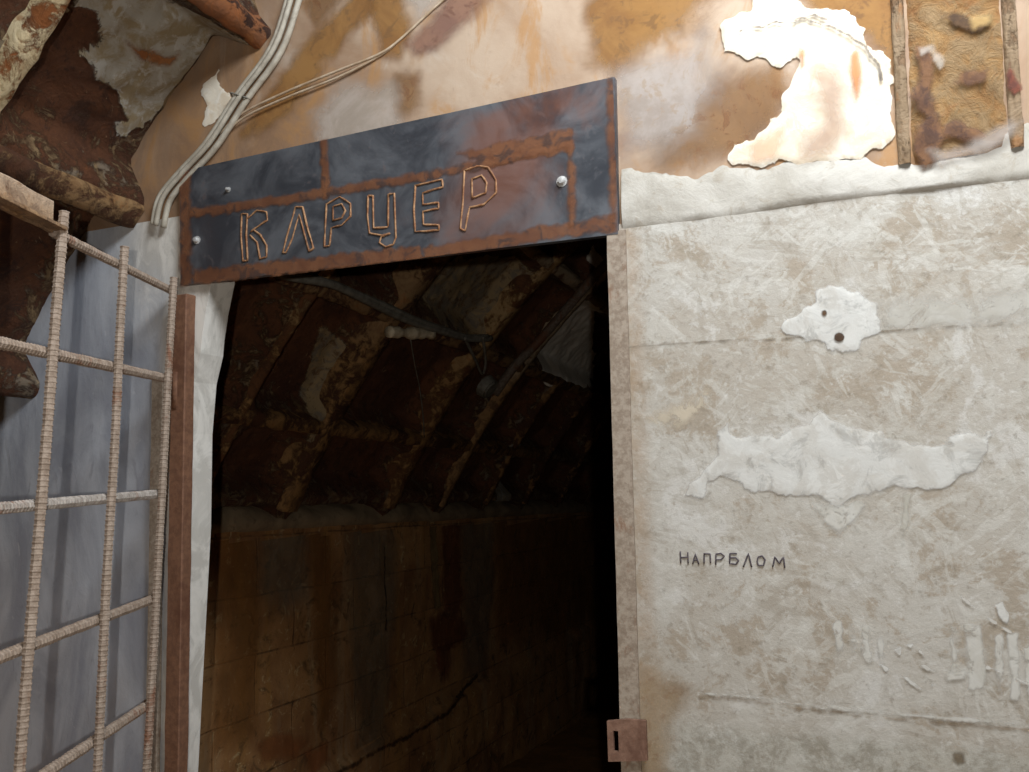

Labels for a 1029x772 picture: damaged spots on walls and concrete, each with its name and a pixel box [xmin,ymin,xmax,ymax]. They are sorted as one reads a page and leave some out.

corrosion [133,48,176,65]
flaking render [720,0,895,168]
crack [740,14,883,81]
corrosion [909,46,987,168]
corrosion [943,12,992,31]
corrosion [1006,69,1022,94]
peeling [781,285,1029,352]
peeling [686,412,991,533]
crack [338,674,478,772]